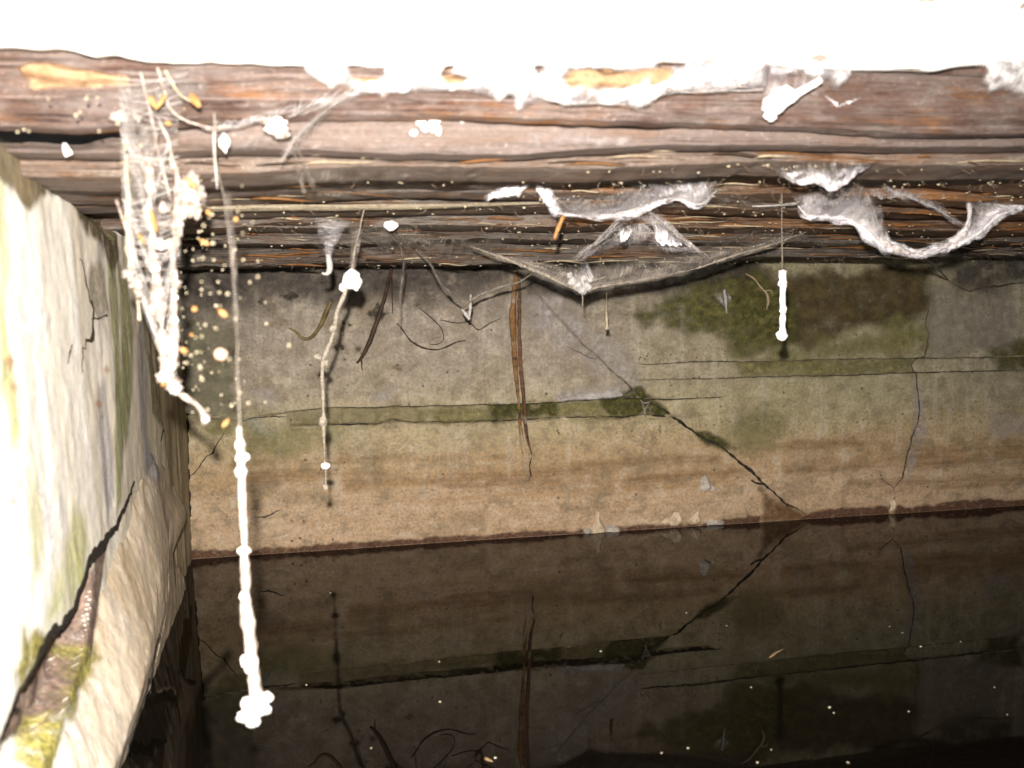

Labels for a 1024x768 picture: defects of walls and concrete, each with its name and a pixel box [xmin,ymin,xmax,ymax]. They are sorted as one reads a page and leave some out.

crack [68,258,108,373]
water stain [529,261,931,350]
water stain [295,406,493,424]
water stain [554,387,667,420]
crack [554,314,806,515]
crack [882,281,1024,512]
water stain [192,511,760,559]
water stain [802,499,1024,519]
crack [12,481,135,716]